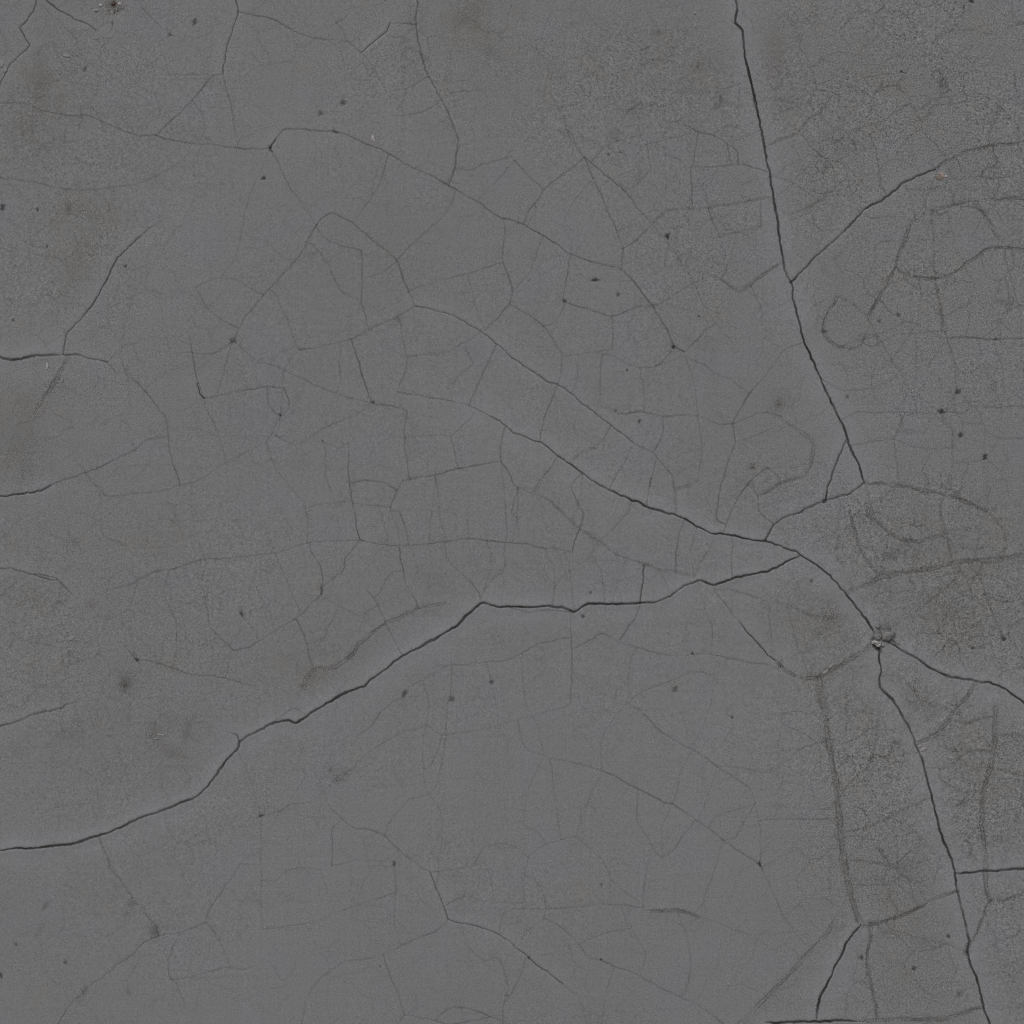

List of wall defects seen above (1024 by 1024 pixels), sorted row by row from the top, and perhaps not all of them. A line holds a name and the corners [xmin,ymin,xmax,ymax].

crack [845,169,935,230]
crack [734,8,863,500]
crack [272,593,673,724]
crack [613,491,911,730]
crack [921,661,1024,703]
crack [0,815,147,851]
crack [173,754,232,807]
crack [921,758,1024,891]
crack [770,927,859,1024]
crack [964,918,990,1024]